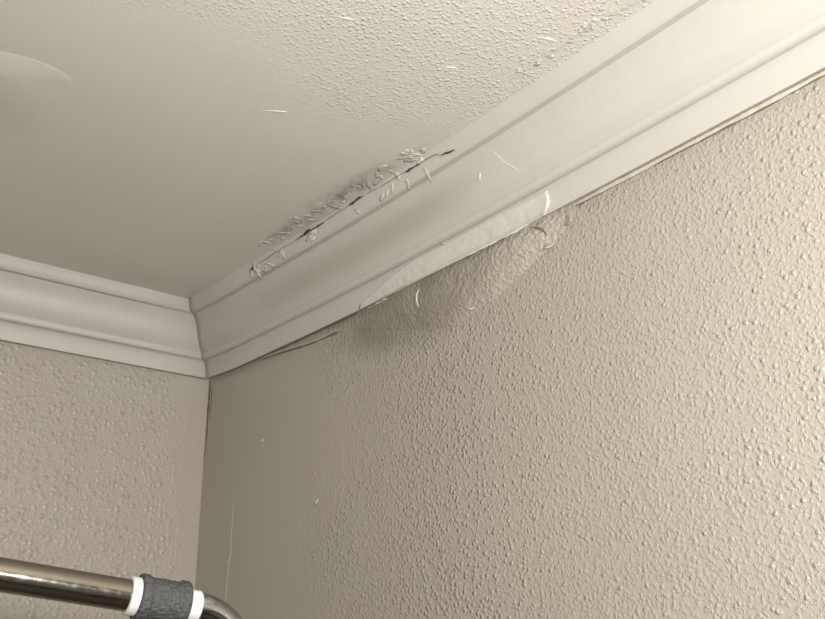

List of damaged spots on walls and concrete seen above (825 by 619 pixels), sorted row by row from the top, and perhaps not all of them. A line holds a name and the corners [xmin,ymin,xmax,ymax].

peeling [249,143,455,280]